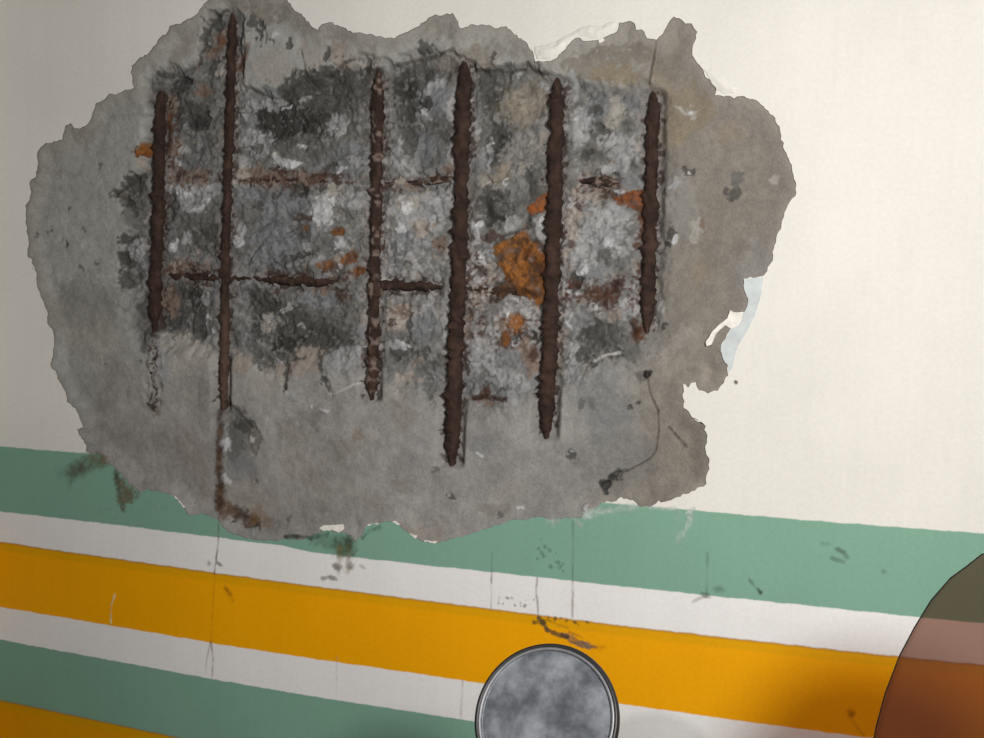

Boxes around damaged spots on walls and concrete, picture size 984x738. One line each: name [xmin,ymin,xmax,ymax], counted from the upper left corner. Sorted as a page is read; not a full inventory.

corrosion [134,143,154,158]
corrosion [527,193,548,215]
corrosion [615,190,645,237]
corrosion [316,251,366,276]
spalling [27,0,796,543]
corrosion [493,231,546,306]
corrosion [502,314,524,346]
corrosion [472,387,507,401]
corrosion [216,401,228,469]
crack [599,410,677,490]